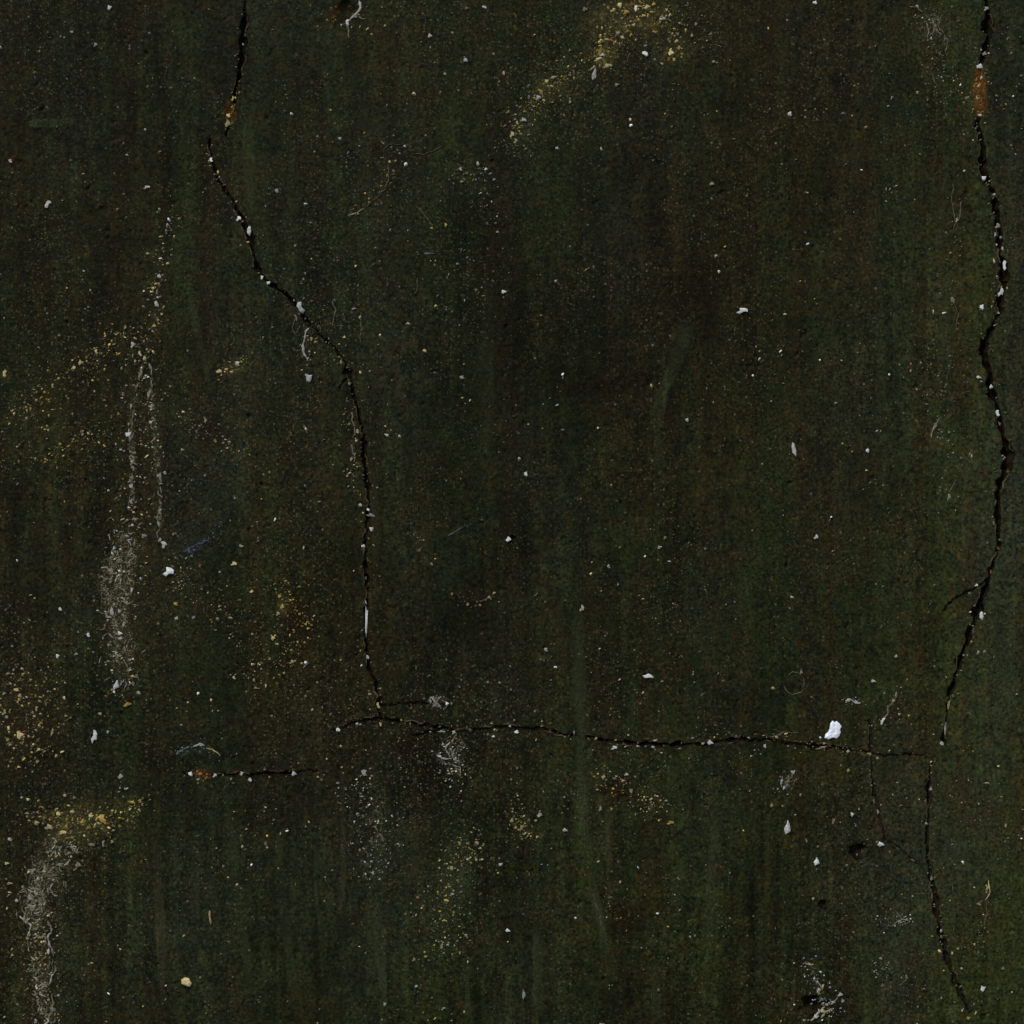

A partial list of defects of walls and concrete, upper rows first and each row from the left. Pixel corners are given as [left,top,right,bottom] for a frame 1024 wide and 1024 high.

crack [184,765,319,783]
crack [205,0,1015,1020]